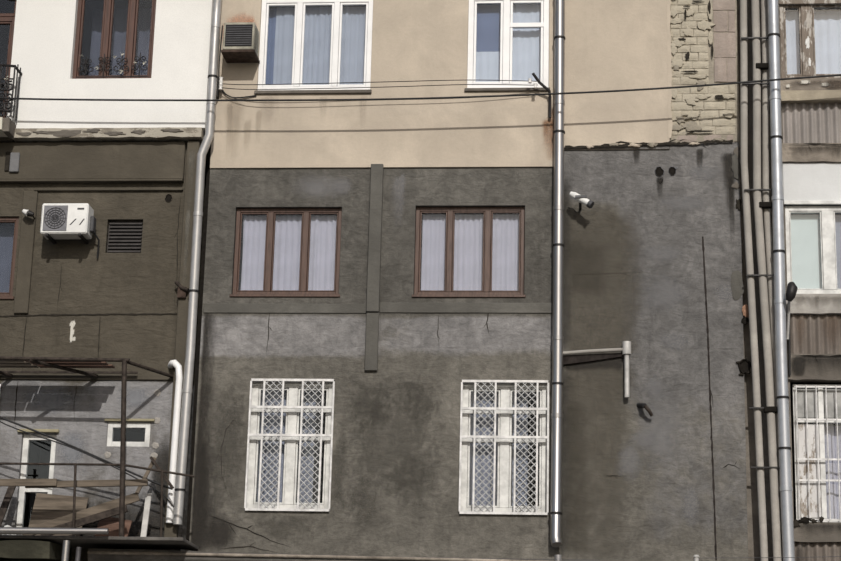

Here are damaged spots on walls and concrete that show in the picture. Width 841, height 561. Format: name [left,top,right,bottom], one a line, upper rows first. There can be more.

spalling [655,166,678,188]
peeling [667,0,741,189]